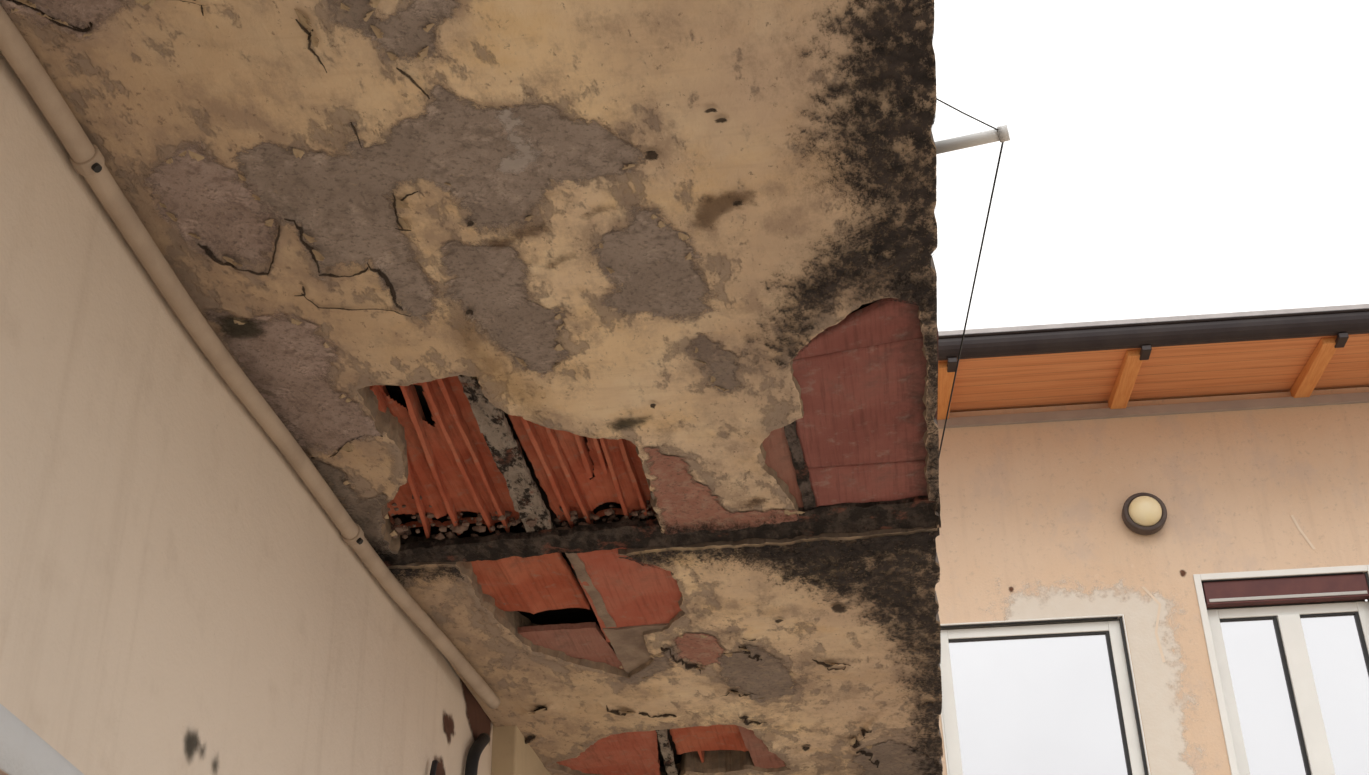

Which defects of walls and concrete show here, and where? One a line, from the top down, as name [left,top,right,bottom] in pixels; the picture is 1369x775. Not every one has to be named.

crack [6,0,93,32]
peeling [327,0,461,63]
crack [198,218,411,317]
peeling [145,83,658,377]
peeling [590,207,741,393]
water stain [612,416,650,430]
water stain [619,0,943,775]
spalling [206,298,941,703]
water stain [372,540,465,590]
spalling [547,724,791,775]